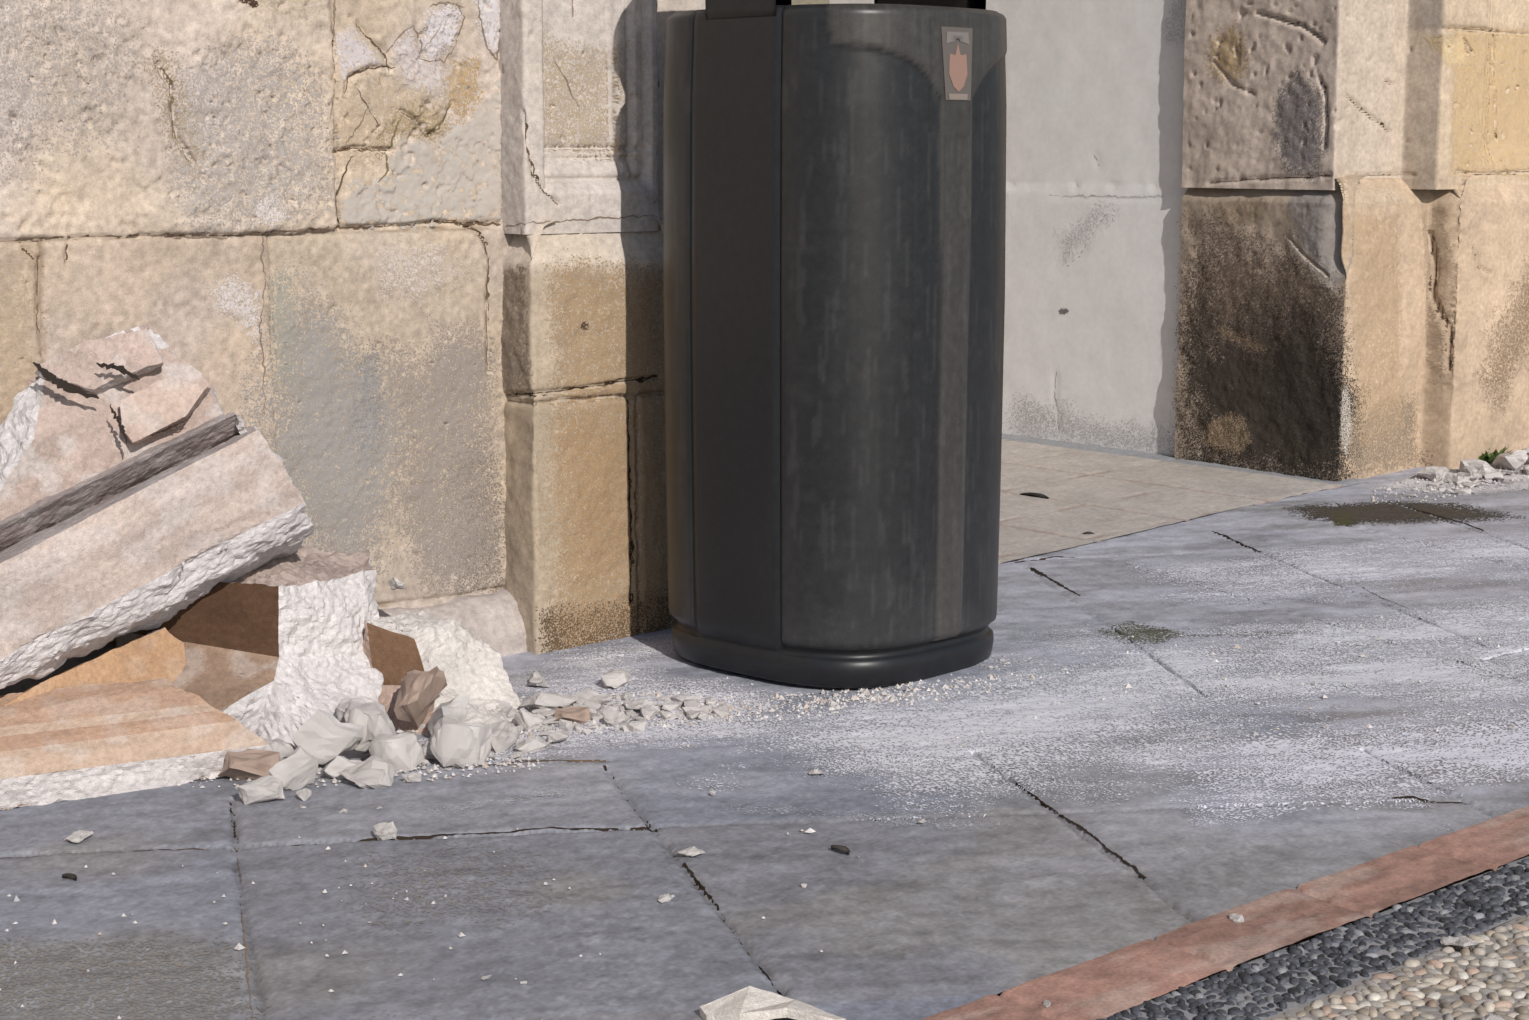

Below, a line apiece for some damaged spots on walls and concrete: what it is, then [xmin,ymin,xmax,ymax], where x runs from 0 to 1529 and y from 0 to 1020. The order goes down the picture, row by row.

crack [0,0,657,603]
spalling [156,0,502,312]
water stain [1279,499,1526,527]